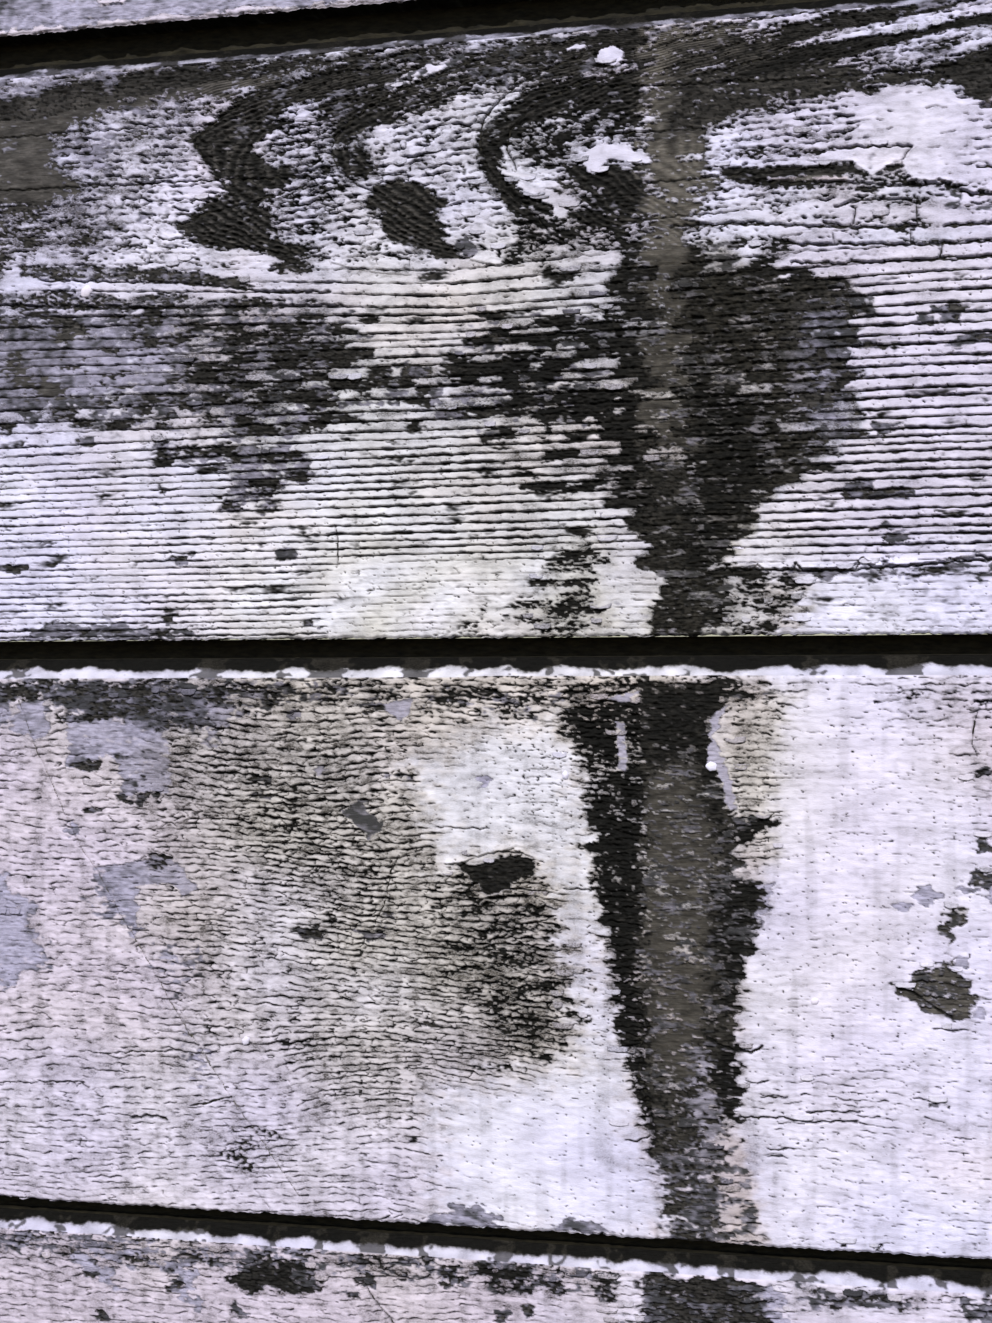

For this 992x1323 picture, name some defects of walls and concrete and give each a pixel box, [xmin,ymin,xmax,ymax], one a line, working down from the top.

peeling [442,850,548,896]
spalling [967,832,992,890]
spalling [938,901,968,943]
spalling [888,960,980,1029]